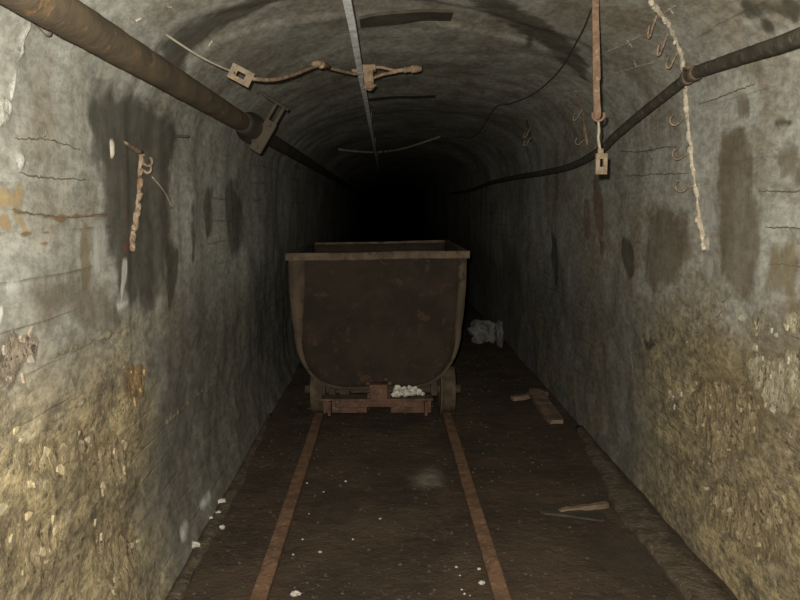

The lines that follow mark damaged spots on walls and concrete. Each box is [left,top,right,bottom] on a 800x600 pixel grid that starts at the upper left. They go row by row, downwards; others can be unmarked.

crack [698,83,755,105]
crack [15,131,80,150]
crack [19,172,87,186]
crack [620,146,689,192]
crack [12,208,105,236]
damp [73,90,178,323]
damp [706,130,755,298]
spalling [0,326,39,389]